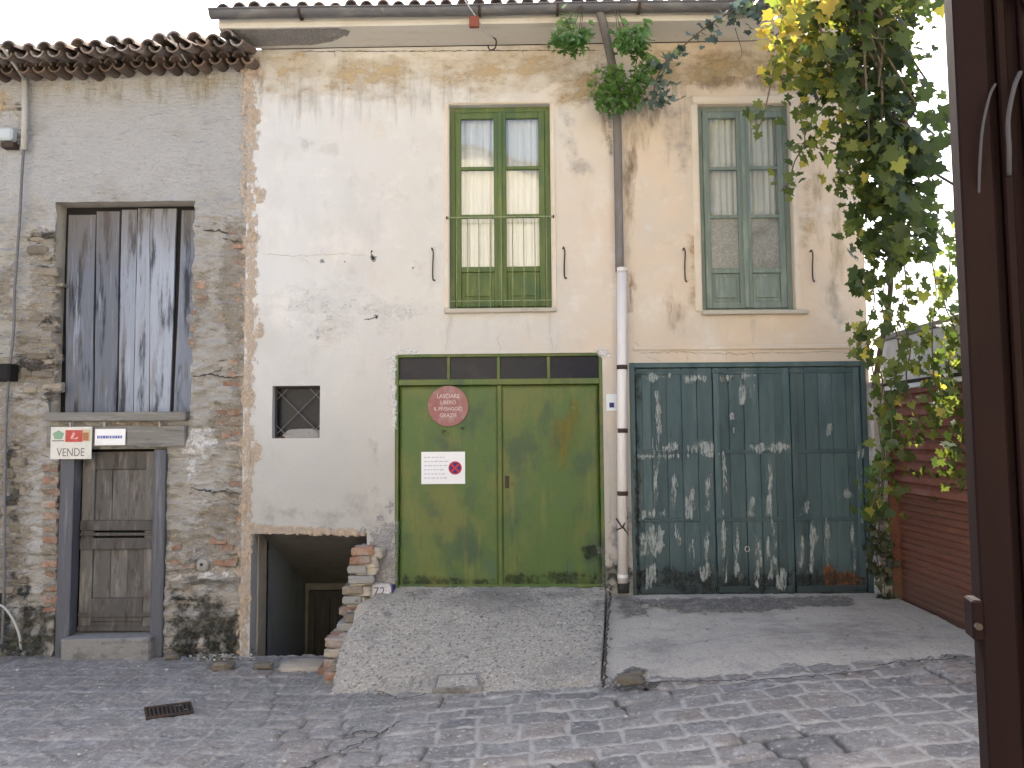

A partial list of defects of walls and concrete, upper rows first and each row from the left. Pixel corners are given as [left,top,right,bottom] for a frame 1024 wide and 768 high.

leakage [325,61,410,90]
leakage [435,56,556,88]
crack [203,229,347,265]
crack [193,367,239,379]
flaking render [170,28,399,684]
crack [194,488,241,505]
spalling [615,372,869,617]
leakage [167,585,253,657]